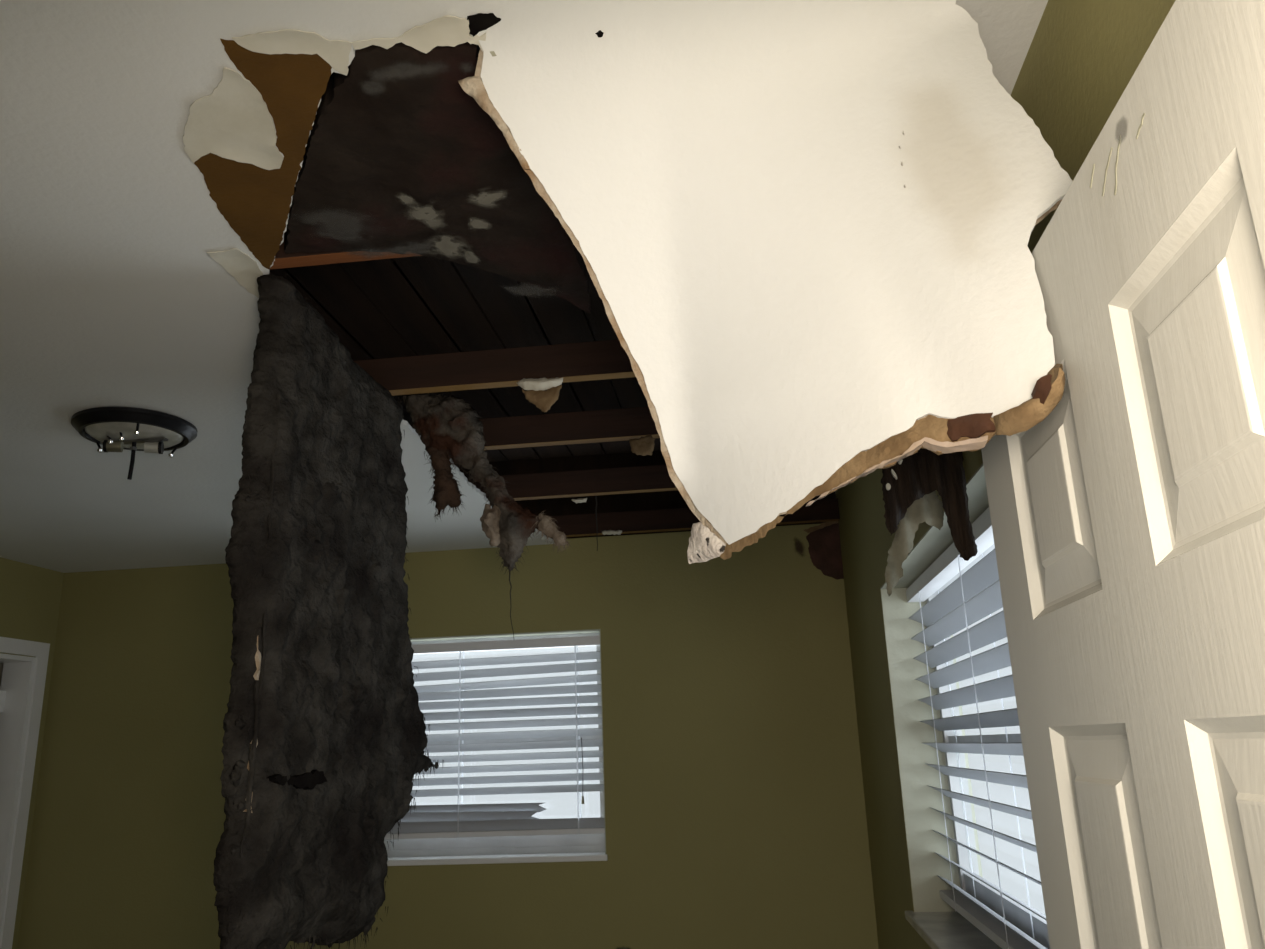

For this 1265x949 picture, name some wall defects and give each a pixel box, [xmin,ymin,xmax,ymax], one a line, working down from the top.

mould [364,64,439,94]
mould [306,195,478,263]
mould [469,191,505,229]
spalling [687,522,726,564]
peeling [806,523,844,580]